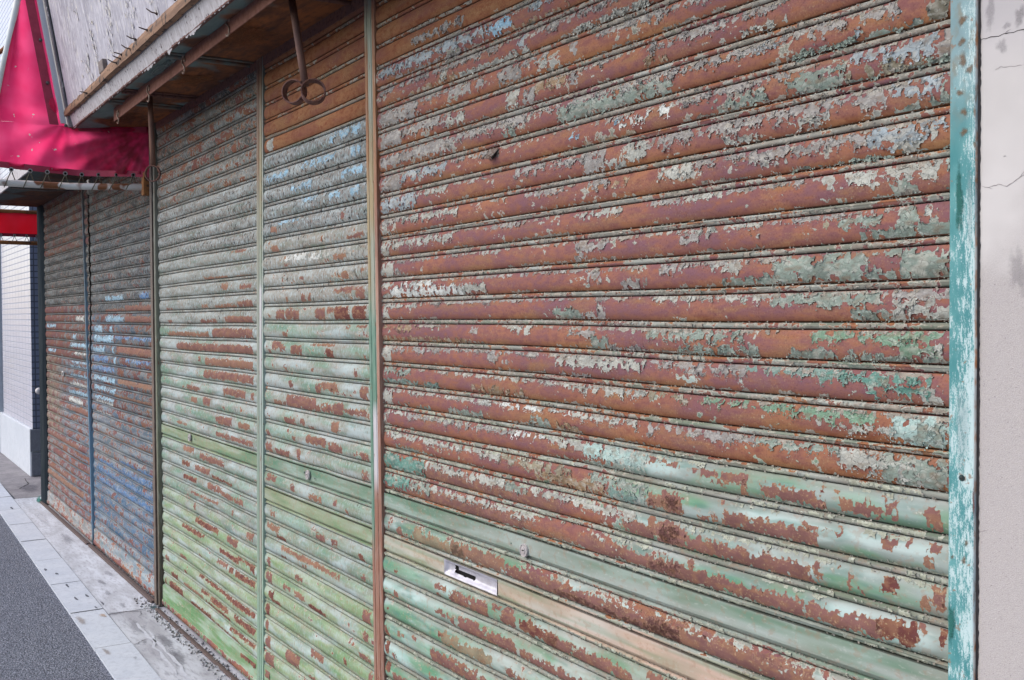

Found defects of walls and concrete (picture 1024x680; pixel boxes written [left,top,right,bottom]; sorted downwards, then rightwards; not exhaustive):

peeling [266,122,363,206]
peeling [68,315,151,416]
rust [166,252,369,460]
peeling [284,249,336,265]
peeling [376,0,963,618]
rust [165,445,340,680]
rust [358,608,373,680]
rust [384,625,417,680]
rust [396,526,815,680]
peeling [384,510,873,680]
rust [410,455,965,650]
peeling [853,597,955,640]